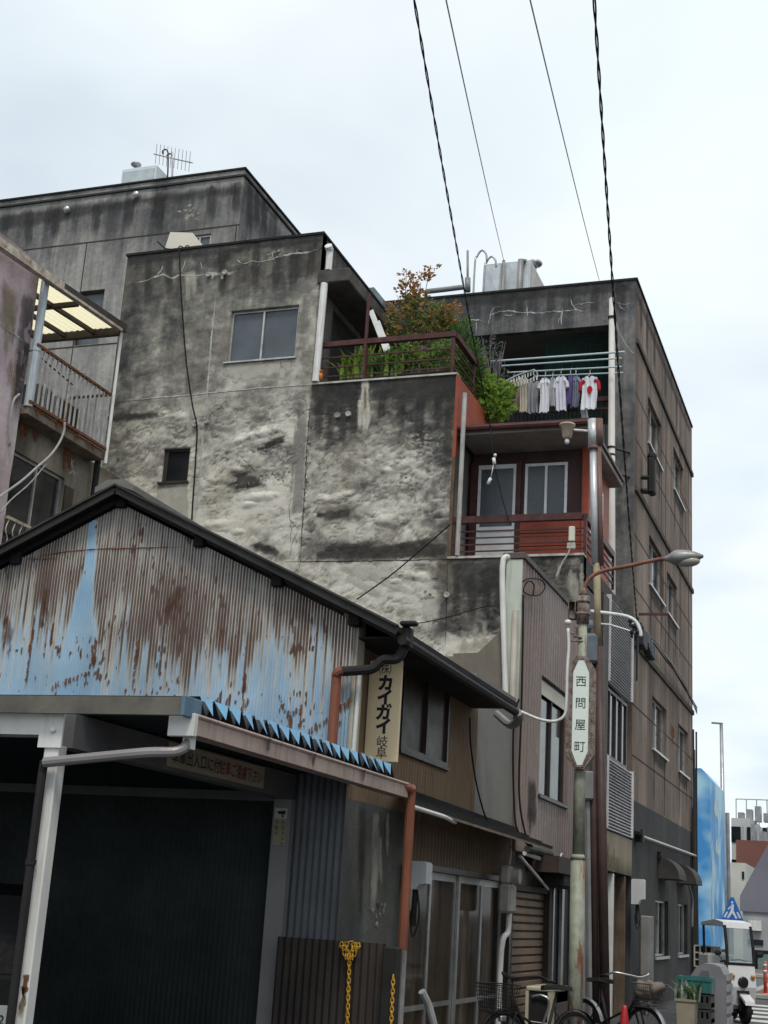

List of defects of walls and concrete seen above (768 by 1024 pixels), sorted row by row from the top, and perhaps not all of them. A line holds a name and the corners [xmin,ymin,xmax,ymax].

leakage [5,184,273,241]
crack [236,248,318,267]
crack [457,300,630,334]
leakage [315,380,453,457]
crack [121,260,449,640]
leakage [317,509,349,519]
corrosion [25,624,45,682]
corrosion [52,637,105,690]
corrosion [124,639,153,696]
leakage [360,811,389,904]